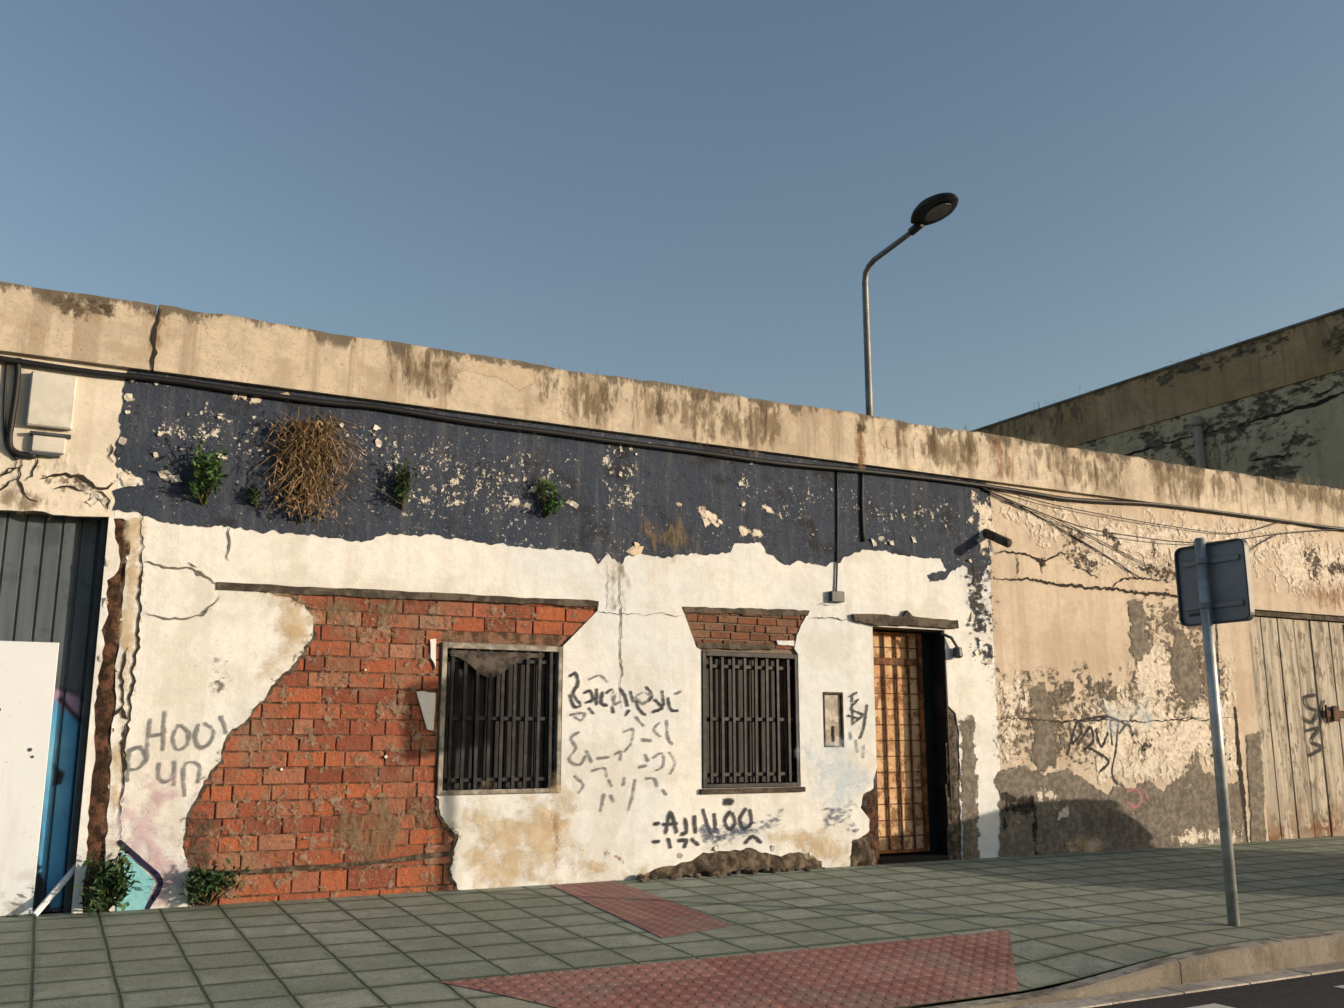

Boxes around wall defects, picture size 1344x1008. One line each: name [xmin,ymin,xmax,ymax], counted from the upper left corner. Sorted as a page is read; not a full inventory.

water stain [53,297,114,317]
crack [0,445,116,510]
peeling [339,423,579,518]
water stain [544,374,780,454]
water stain [922,403,1123,489]
crack [1124,381,1344,456]
water stain [1128,372,1344,514]
crack [1248,453,1290,461]
crack [113,514,231,839]
peeling [762,485,1344,866]
flaking render [180,591,597,906]
flaking render [636,845,825,883]